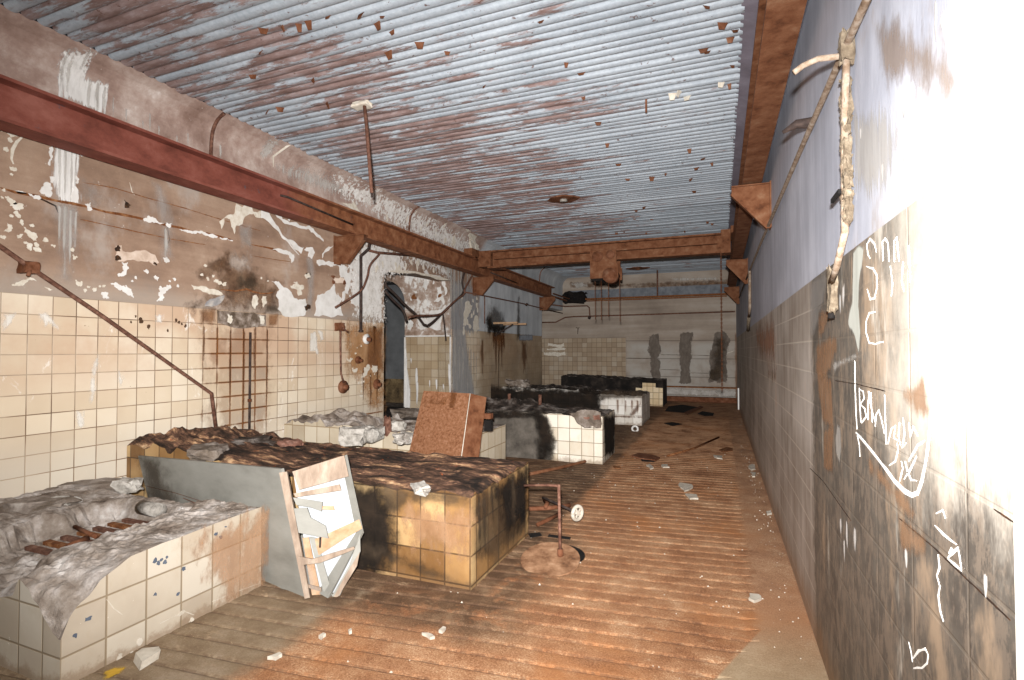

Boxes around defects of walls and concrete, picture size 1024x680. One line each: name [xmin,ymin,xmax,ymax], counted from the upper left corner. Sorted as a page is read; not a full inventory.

peeling [0,188,56,253]
peeling [260,139,479,252]
peeling [75,245,179,301]
peeling [192,204,453,330]
peeling [462,297,480,335]
corrosion [346,326,384,408]